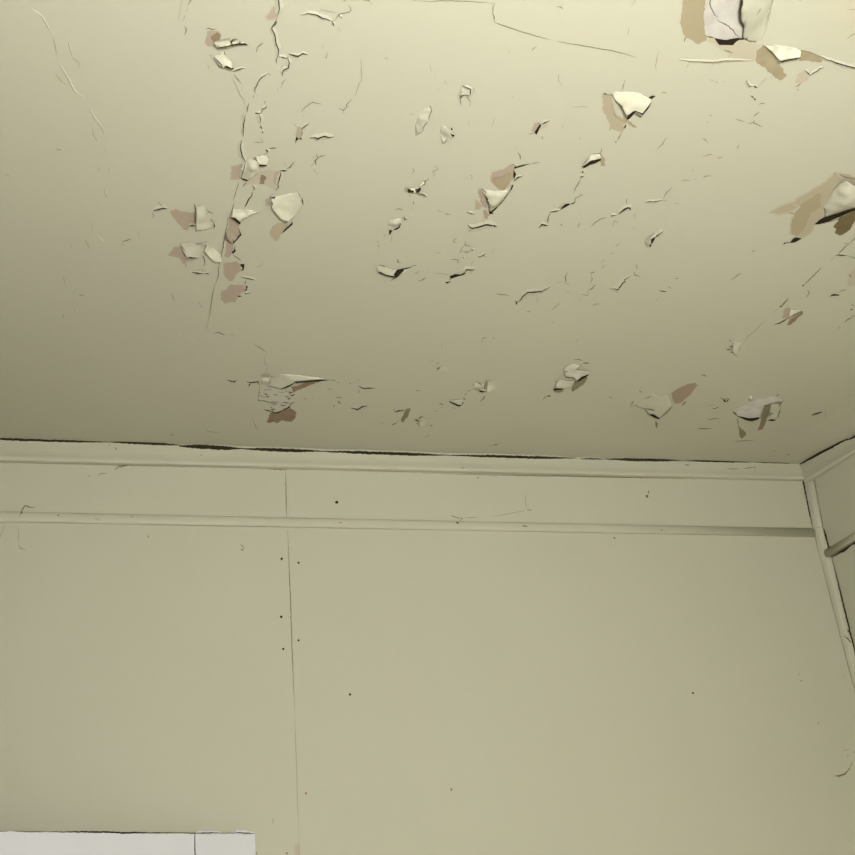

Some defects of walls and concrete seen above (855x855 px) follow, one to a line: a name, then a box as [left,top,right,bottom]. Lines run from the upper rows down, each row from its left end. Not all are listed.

crack [415,0,659,71]
peeling [679,0,824,90]
crack [801,50,855,71]
peeling [602,81,655,143]
peeling [168,147,305,304]
crack [192,0,370,370]
crack [417,210,497,285]
peeling [474,148,540,219]
peeling [766,170,855,245]
crack [743,238,855,344]
peeling [247,373,335,423]
crack [0,433,855,855]